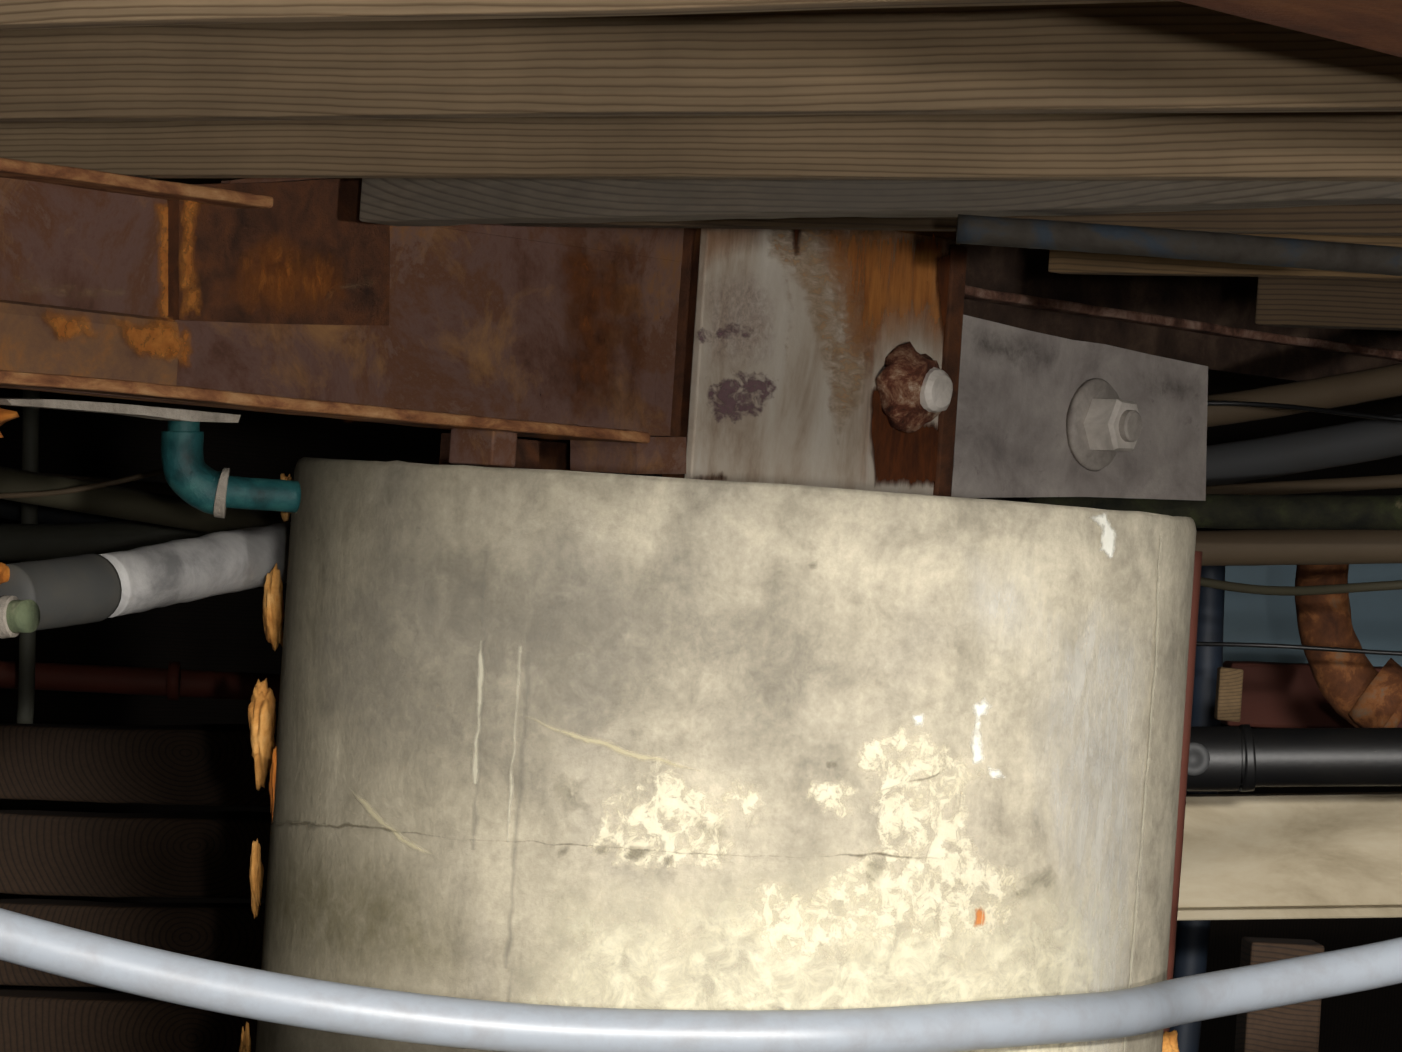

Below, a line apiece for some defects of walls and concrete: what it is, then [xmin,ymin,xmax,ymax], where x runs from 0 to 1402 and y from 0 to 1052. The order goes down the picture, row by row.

rust [46,315,92,339]
rust [124,200,199,364]
rust [793,229,801,253]
rust [831,230,951,345]
rust [871,388,939,486]
crack [273,822,391,831]